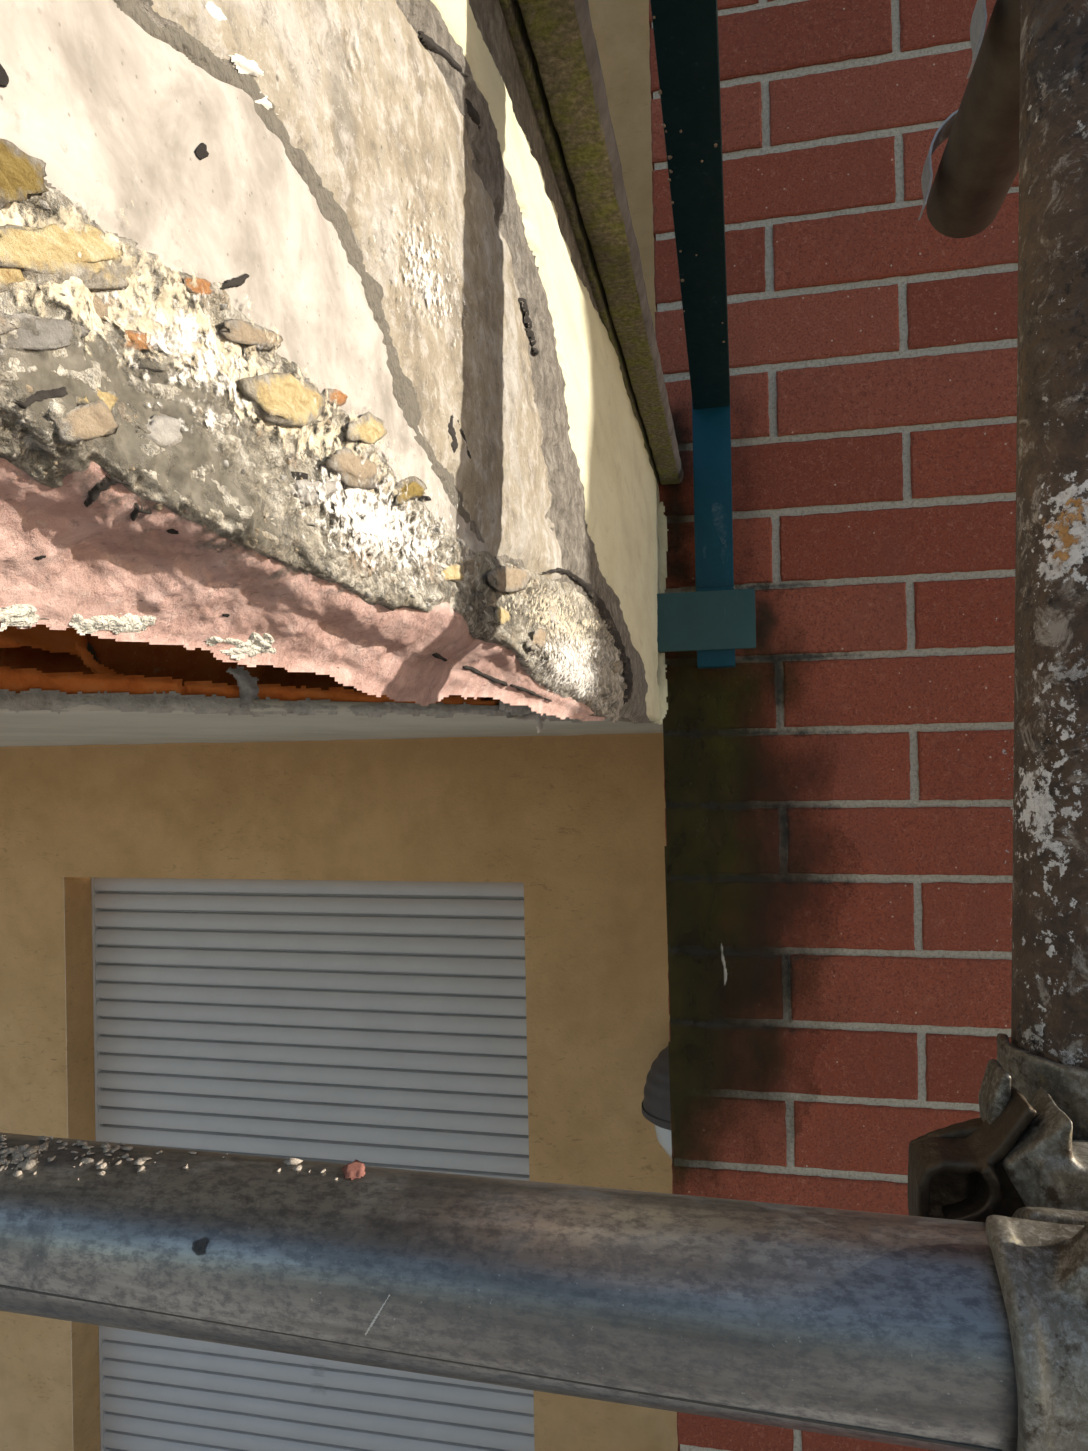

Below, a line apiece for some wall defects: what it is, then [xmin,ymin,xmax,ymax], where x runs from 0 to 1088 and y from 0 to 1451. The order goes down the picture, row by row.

flaking render [0,0,651,733]
damp [669,943,799,998]